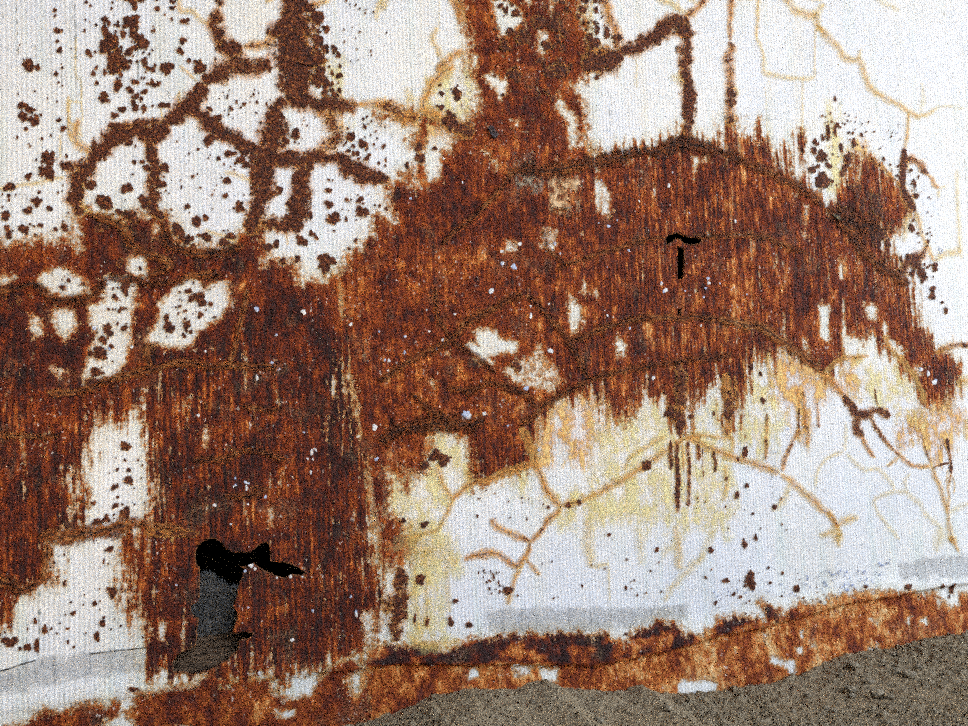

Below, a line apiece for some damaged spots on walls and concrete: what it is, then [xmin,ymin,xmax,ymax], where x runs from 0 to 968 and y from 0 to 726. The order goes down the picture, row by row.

crack [0,0,476,307]
rust [371,99,449,155]
crack [441,0,955,286]
rust [796,126,808,168]
rust [828,125,917,272]
rust [112,284,176,376]
crack [46,290,280,401]
crack [376,287,968,604]
rust [661,440,687,513]
crack [0,517,198,596]
rust [0,586,20,634]
crack [90,646,148,654]